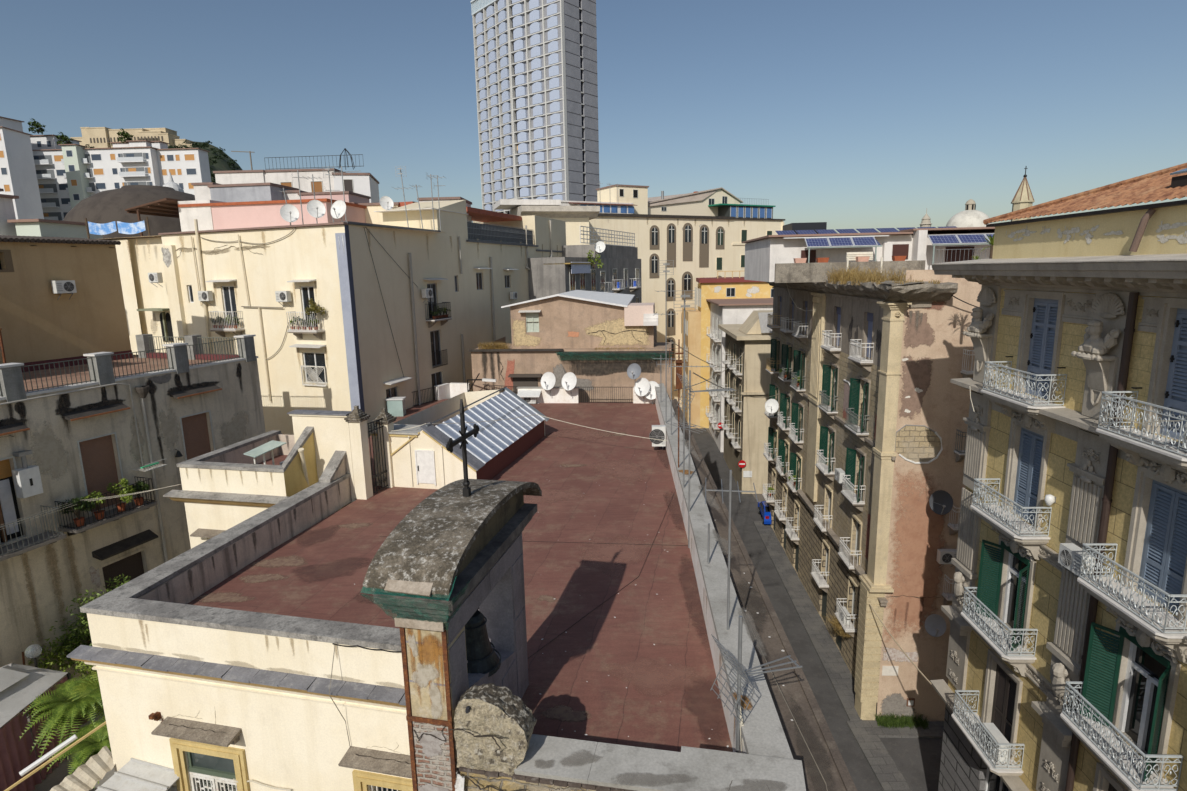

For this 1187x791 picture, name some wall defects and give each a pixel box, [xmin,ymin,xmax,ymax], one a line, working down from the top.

leakage [55,385,125,428]
flaking render [895,312,943,464]
flaking render [408,635,447,758]
flaking render [418,774,464,791]